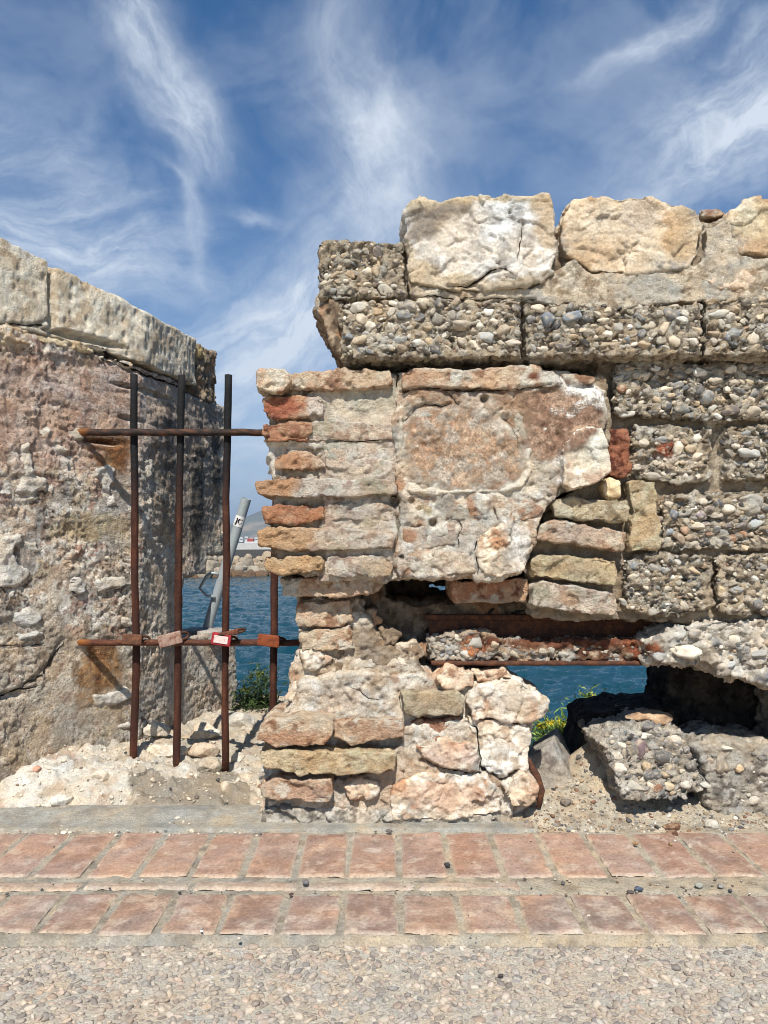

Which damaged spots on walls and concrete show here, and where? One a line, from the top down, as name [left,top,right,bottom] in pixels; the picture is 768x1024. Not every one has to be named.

crack [409,228,534,357]
rust [461,634,663,660]